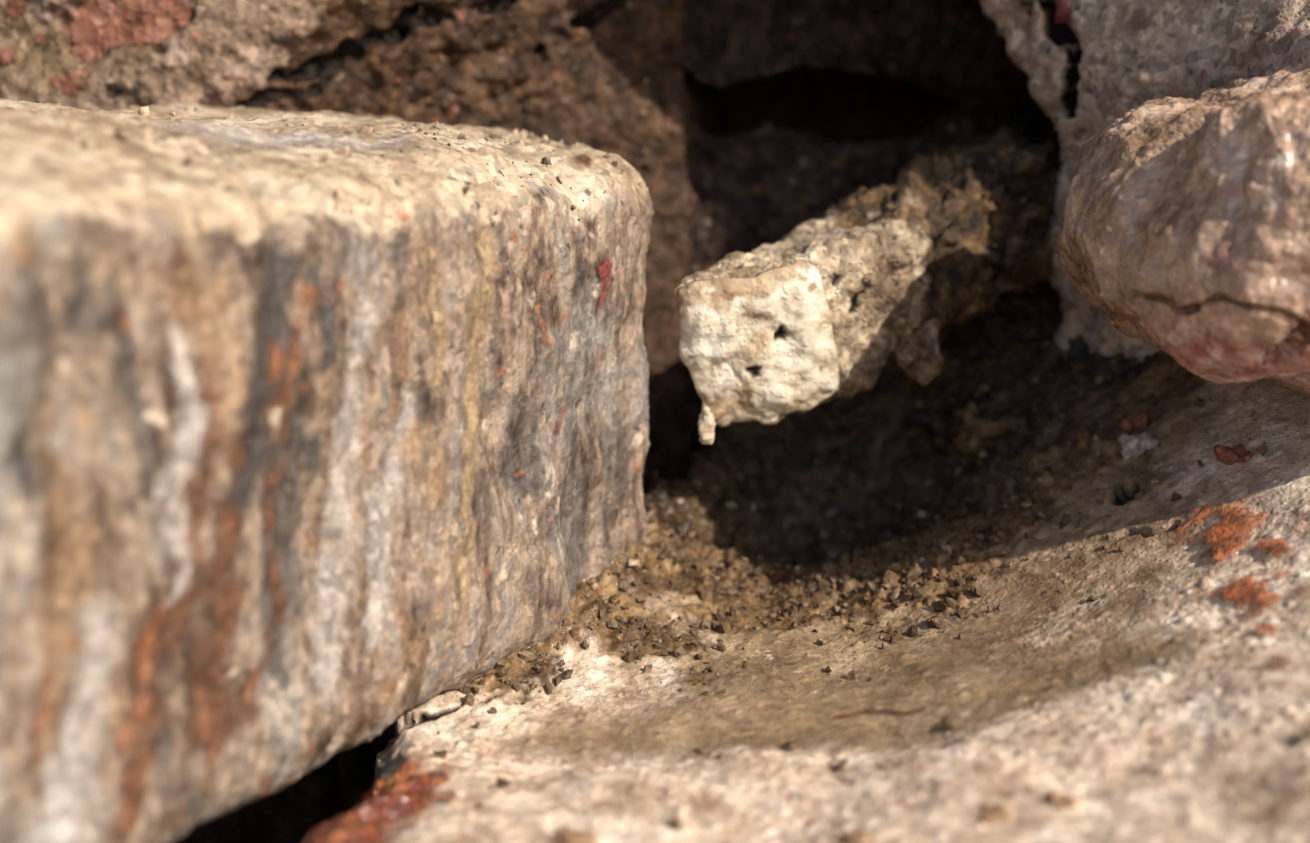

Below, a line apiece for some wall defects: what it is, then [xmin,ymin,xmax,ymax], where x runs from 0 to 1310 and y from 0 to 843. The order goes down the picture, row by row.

crack [1020,0,1083,117]
corrosion [1175,499,1309,634]
corrosion [305,757,459,843]